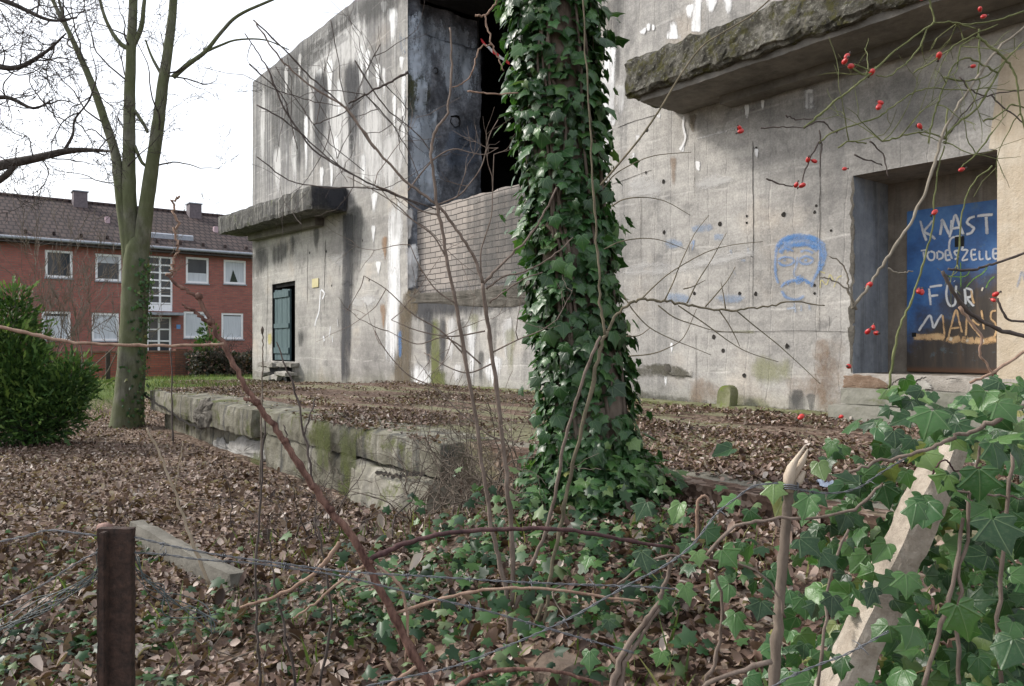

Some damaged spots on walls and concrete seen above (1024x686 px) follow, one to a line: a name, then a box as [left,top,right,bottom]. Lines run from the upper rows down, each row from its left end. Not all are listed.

water stain [261,0,527,384]
water stain [254,237,294,272]
crack [375,468,425,479]